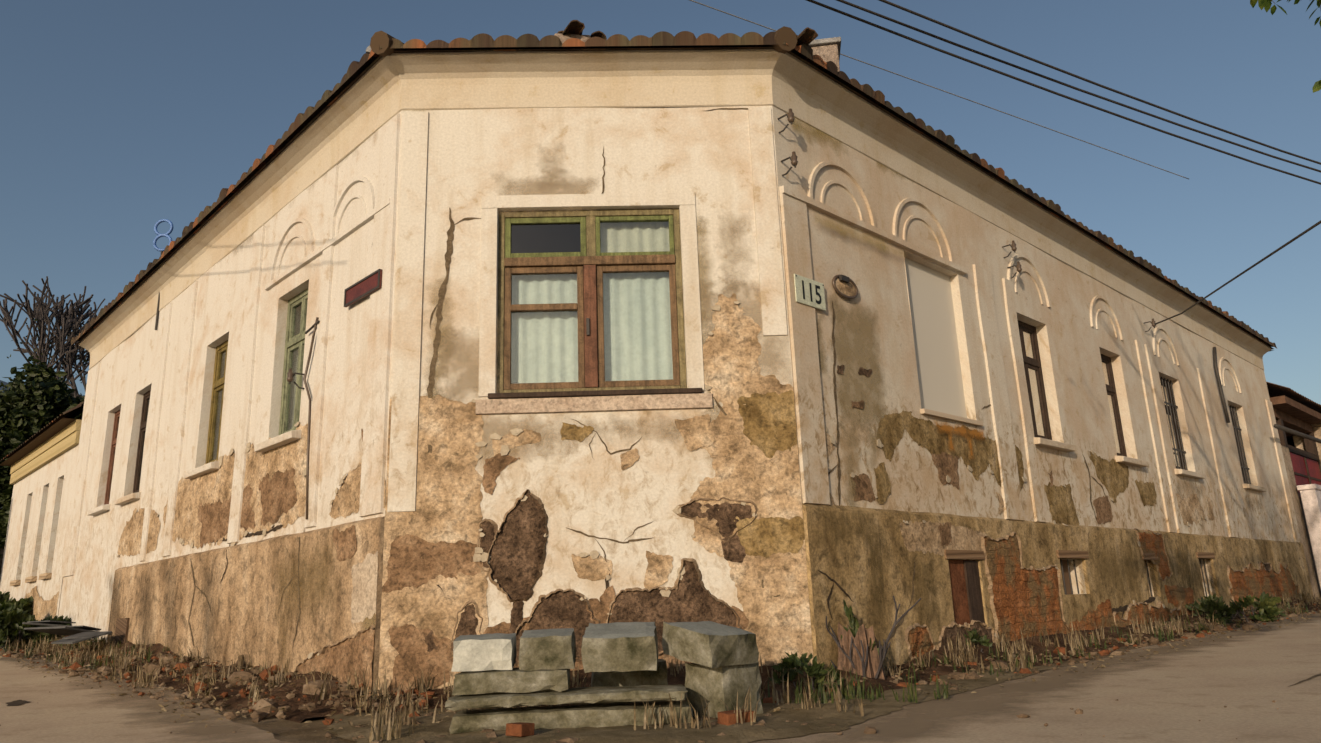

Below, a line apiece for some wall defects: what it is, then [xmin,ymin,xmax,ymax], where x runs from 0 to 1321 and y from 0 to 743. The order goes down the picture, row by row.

crack [599,147,607,194]
crack [427,208,481,399]
peeling [837,365,872,377]
peeling [117,422,308,558]
peeling [294,293,813,699]
crack [572,419,642,458]
peeling [850,411,1004,515]
peeling [1015,445,1027,492]
peeling [1087,450,1157,524]
crack [567,522,654,589]
flaking render [900,520,1199,660]
flaking render [1227,561,1300,612]